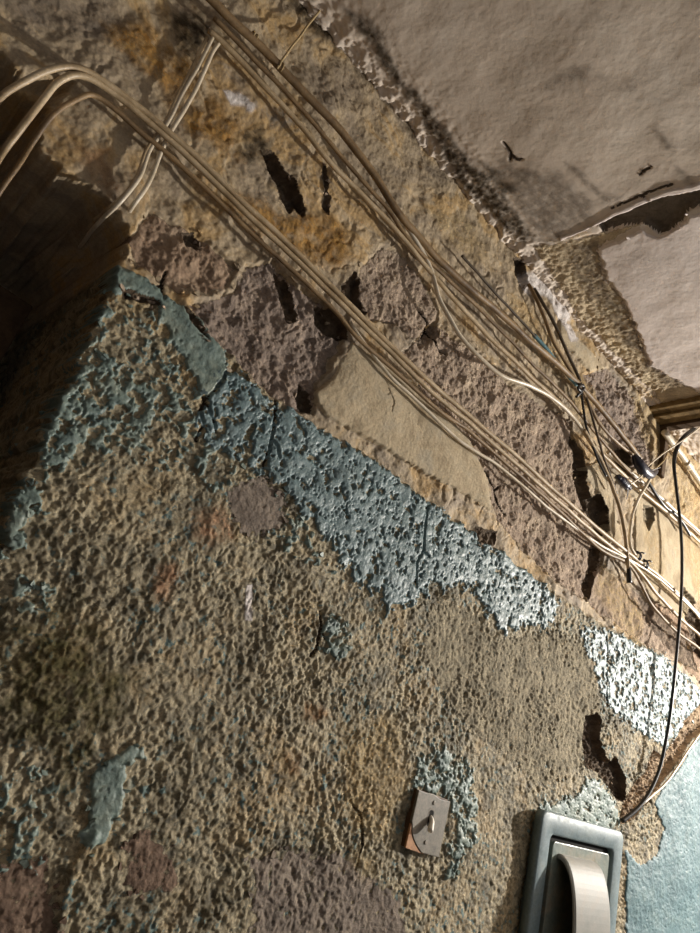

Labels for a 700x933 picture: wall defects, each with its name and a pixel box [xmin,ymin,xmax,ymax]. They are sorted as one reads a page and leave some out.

spalling [261,149,306,218]
spalling [321,163,332,215]
crack [418,312,446,355]
crack [194,390,216,443]
crack [260,400,277,476]
peeling [0,214,700,933]
crack [309,611,325,657]